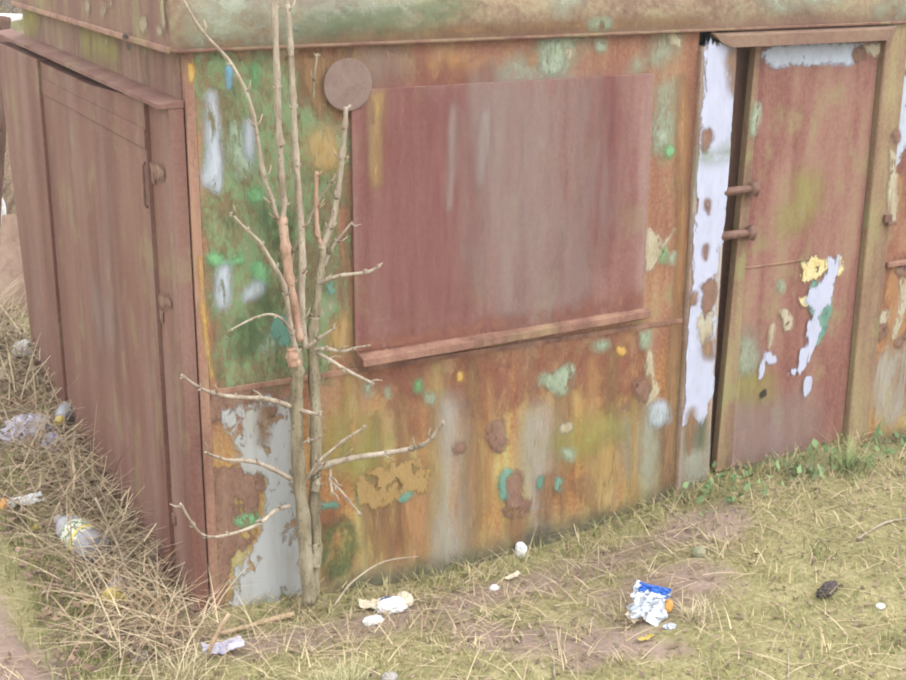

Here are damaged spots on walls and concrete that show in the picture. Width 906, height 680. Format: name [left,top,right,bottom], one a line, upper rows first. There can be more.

rust [852,47,866,63]
peeling [864,43,881,57]
peeling [758,309,793,380]
peeling [788,254,845,397]
rust [878,258,906,390]
peeling [221,394,302,607]